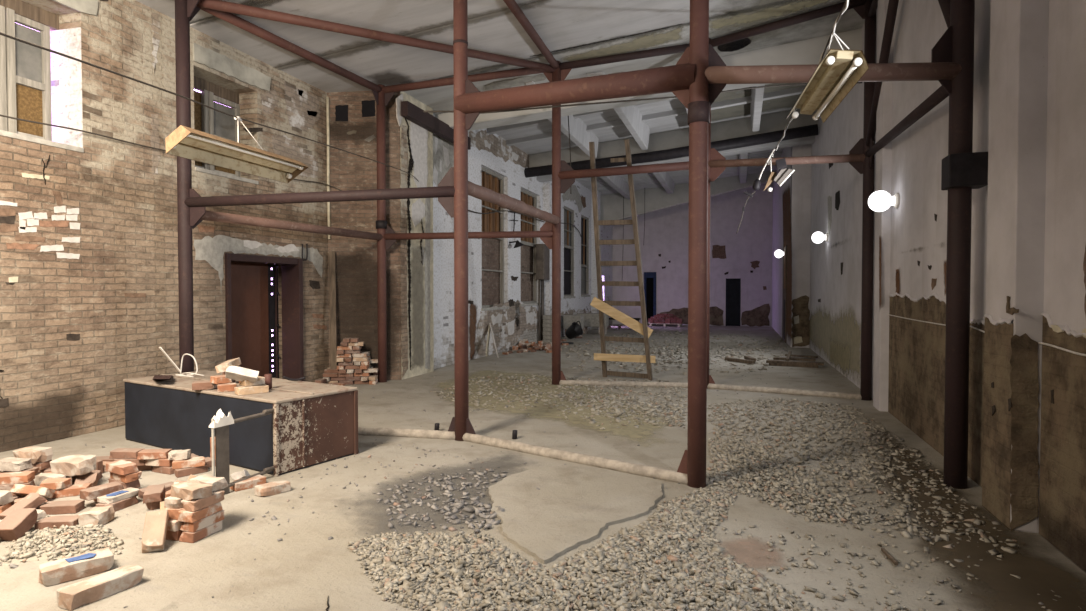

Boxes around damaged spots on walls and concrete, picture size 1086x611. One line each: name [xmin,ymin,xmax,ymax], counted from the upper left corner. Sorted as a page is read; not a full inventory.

leakage [232,0,282,15]
leakage [276,21,453,69]
leakage [468,0,548,24]
leakage [527,23,690,61]
leakage [709,0,828,29]
peeling [0,173,80,259]
flaking render [194,225,323,293]
flaking render [396,94,454,378]
flaking render [468,299,541,356]
flaking render [888,260,946,457]
crack [0,370,9,407]
flaking render [967,296,1086,559]